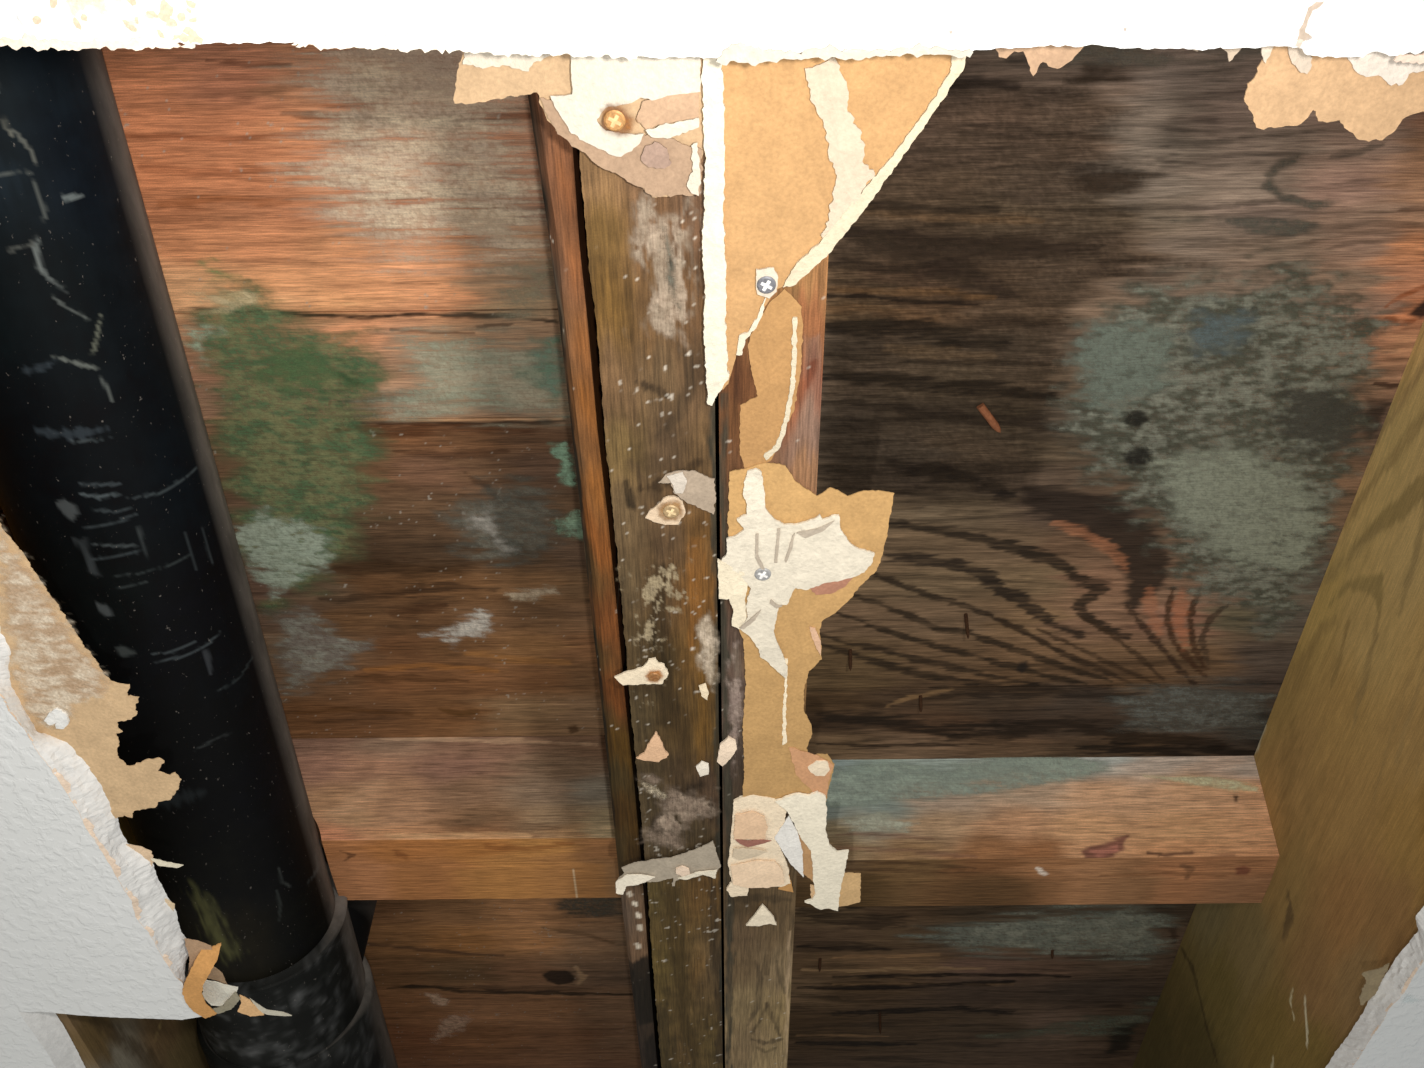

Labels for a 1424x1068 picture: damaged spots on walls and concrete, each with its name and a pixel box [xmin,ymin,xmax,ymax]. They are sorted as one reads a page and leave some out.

peeling [33,0,105,30]
peeling [122,0,203,44]
water stain [1070,44,1172,84]
water stain [284,48,553,317]
water stain [1052,258,1398,636]
water stain [188,279,561,694]
mould [826,757,1098,831]